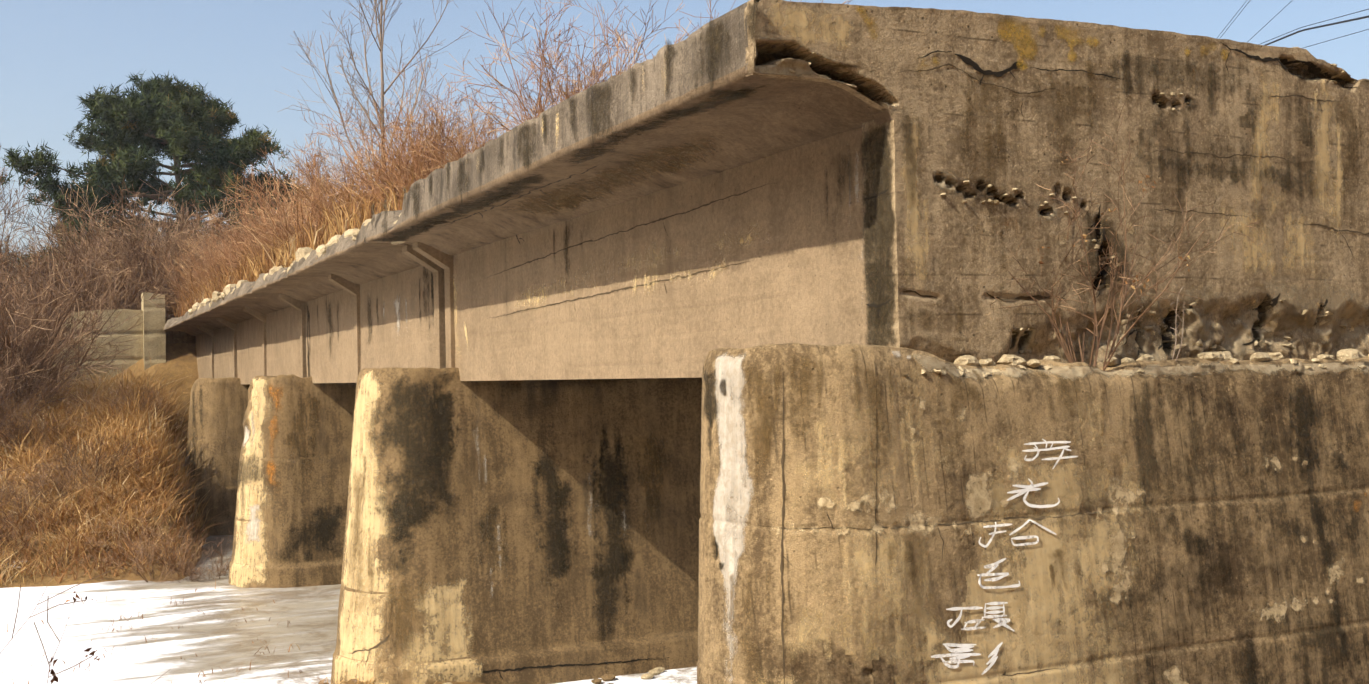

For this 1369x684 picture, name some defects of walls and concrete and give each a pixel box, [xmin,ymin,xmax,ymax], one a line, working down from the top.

crack [898,50,1125,124]
spalling [933,172,1139,290]
spalling [905,282,1369,380]
water stain [1112,53,1358,276]
crack [1221,42,1369,113]
water stain [230,371,482,684]
water stain [534,430,634,643]
water stain [1210,385,1365,684]